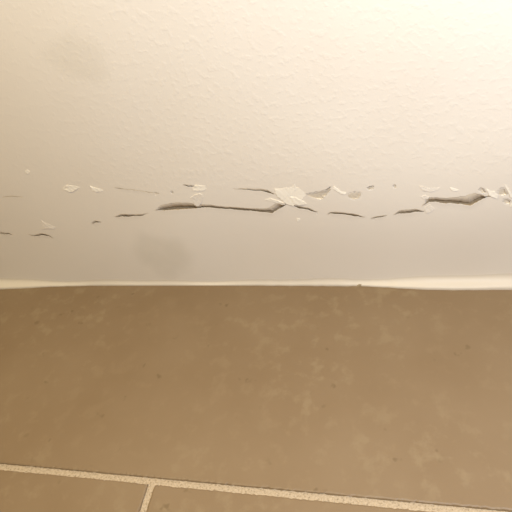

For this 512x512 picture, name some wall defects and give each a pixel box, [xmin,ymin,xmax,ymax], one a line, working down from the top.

crack [113,187,491,221]
peeling [266,184,374,206]
crack [29,232,53,240]